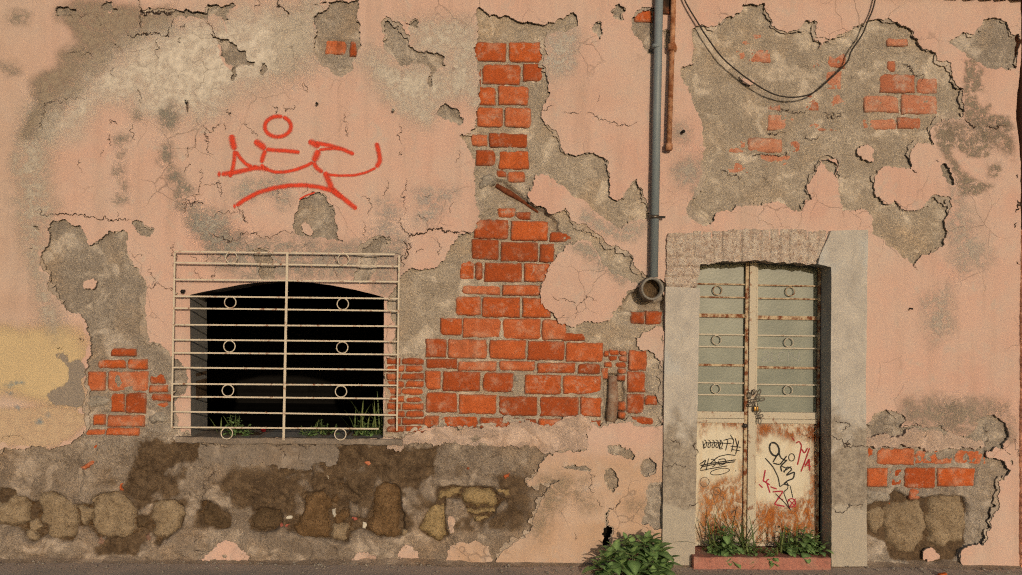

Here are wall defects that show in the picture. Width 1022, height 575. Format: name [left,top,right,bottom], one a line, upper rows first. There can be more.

crack [67,0,221,57]
flaking render [950,18,1016,70]
flaking render [680,4,963,264]
crack [40,209,131,221]
crack [129,112,338,291]
flaking render [0,1,670,562]
corrosion [757,424,816,463]
corrosion [701,475,742,537]
corrosion [756,478,816,542]
flaking render [866,410,1012,564]